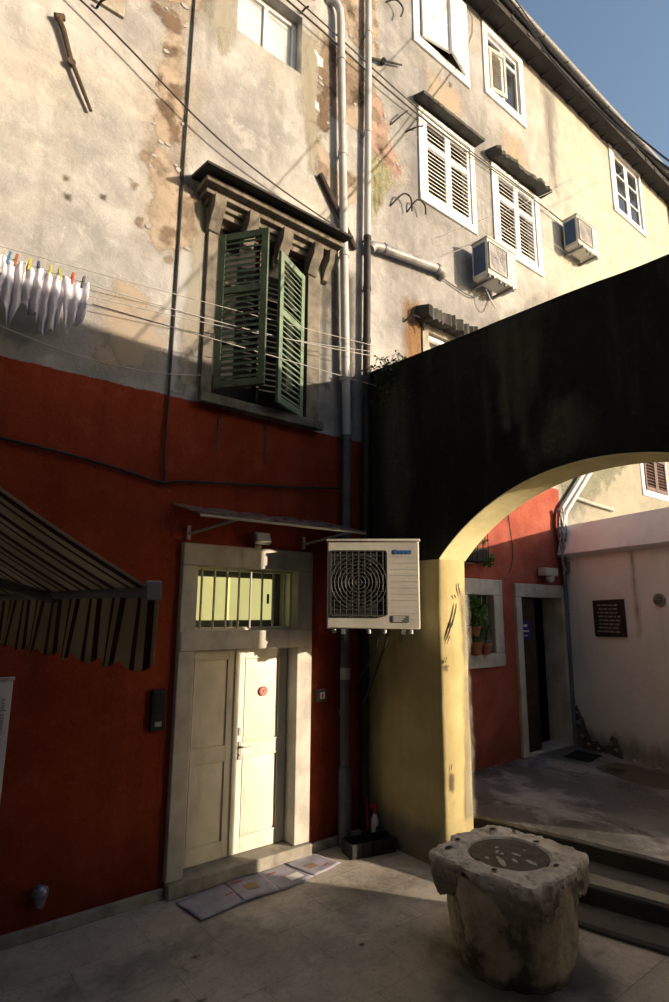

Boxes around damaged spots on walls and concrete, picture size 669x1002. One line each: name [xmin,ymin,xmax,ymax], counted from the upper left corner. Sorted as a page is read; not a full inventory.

flaking render [136,0,206,263]
flaking render [316,143,358,204]
flaking render [314,0,401,175]
flaking render [575,706,623,759]